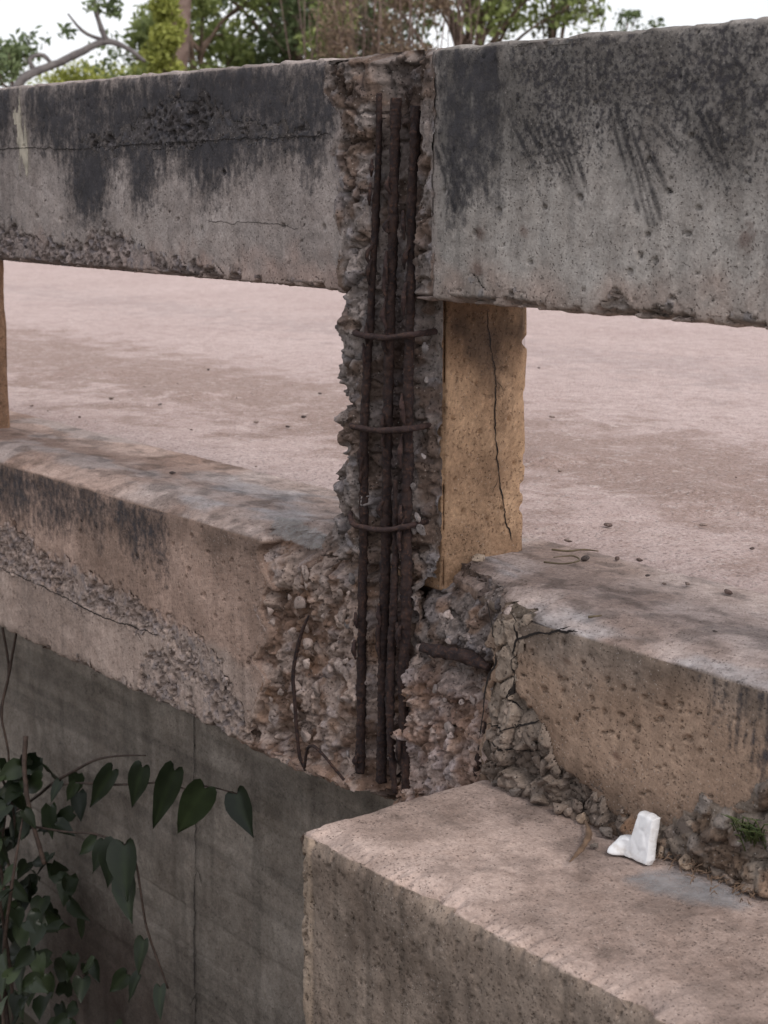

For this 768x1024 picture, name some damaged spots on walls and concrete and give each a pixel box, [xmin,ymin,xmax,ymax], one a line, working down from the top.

spalling [512,38,585,48]
crack [0,130,328,156]
leakage [0,61,335,223]
leakage [432,23,768,228]
spalling [600,288,767,327]
spalling [0,48,636,837]
crack [486,311,512,540]
leakage [0,468,169,577]
crack [2,568,157,639]
crack [479,598,578,752]
spalling [656,779,768,899]